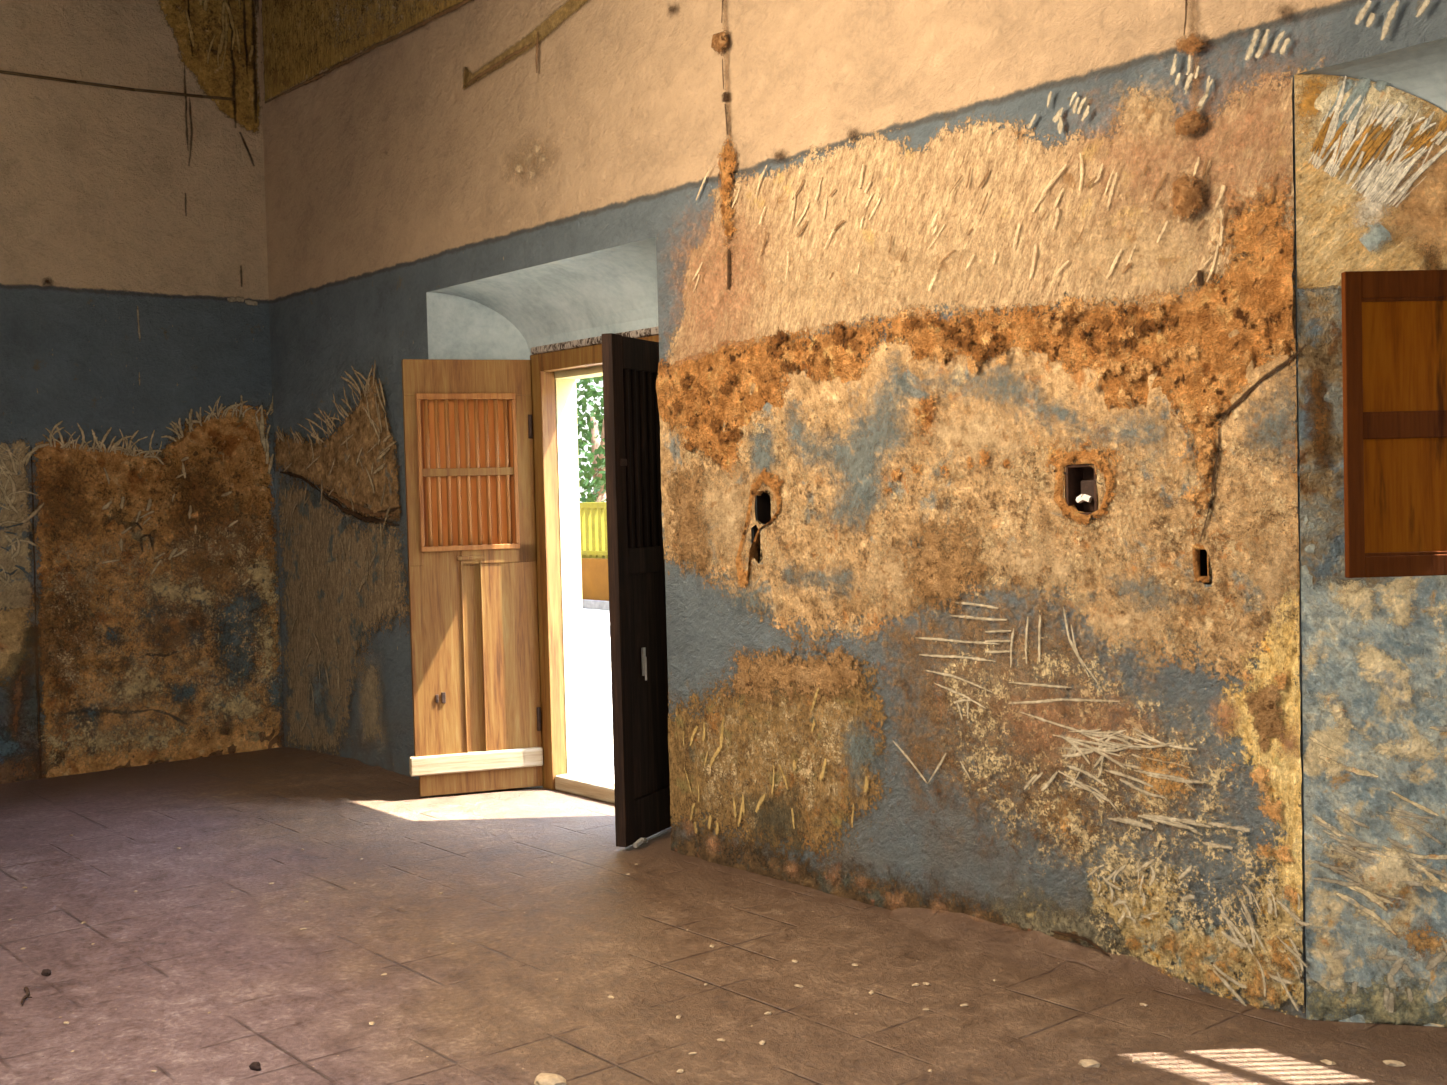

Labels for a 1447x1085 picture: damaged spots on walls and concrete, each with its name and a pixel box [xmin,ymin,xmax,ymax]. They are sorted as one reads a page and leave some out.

peeling [159,0,472,134]
crack [721,59,729,135]
crack [725,249,733,290]
flaking render [0,395,410,778]
crack [280,471,401,526]
flaking render [656,57,1447,1027]
crack [1192,344,1307,542]